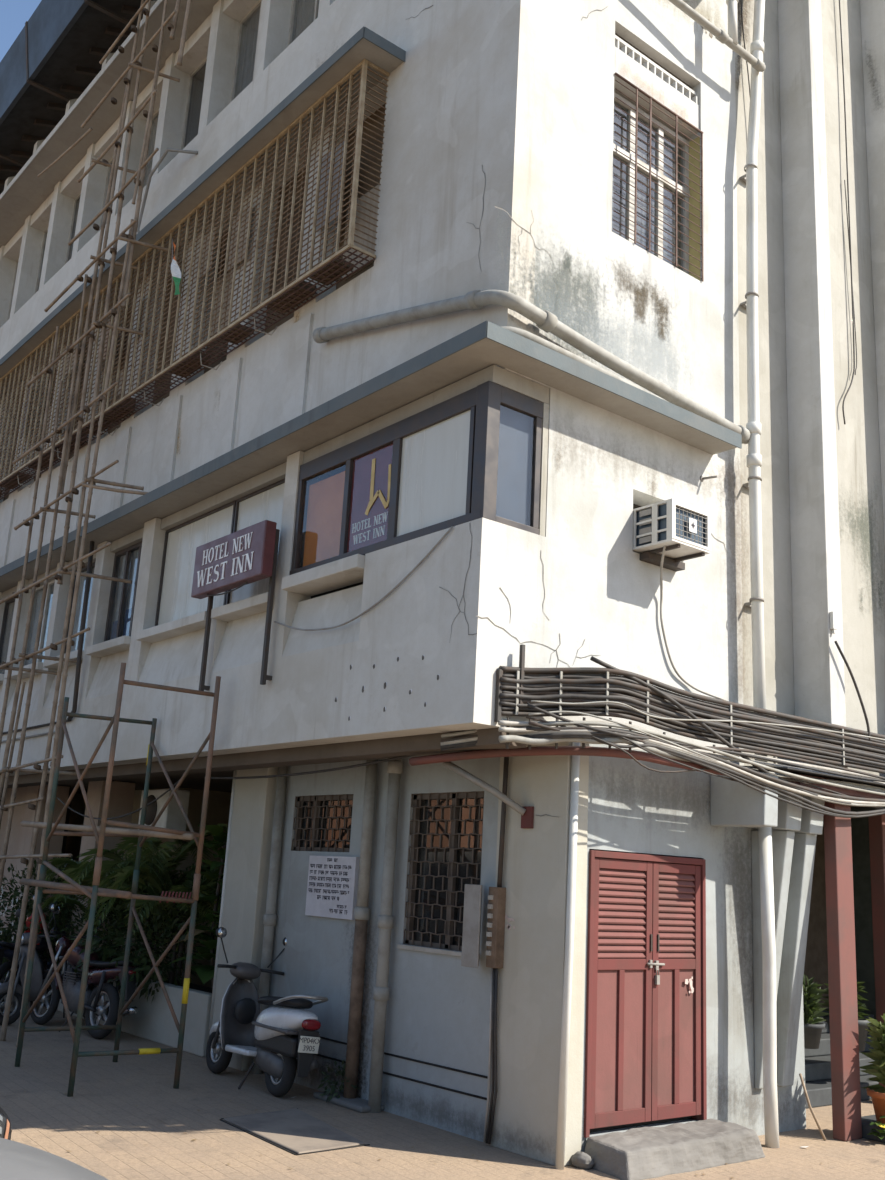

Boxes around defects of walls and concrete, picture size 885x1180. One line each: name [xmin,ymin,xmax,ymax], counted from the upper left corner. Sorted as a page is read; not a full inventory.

crack [466,165,554,272]
leakage [530,257,593,336]
leakage [618,271,667,336]
crack [439,523,601,668]